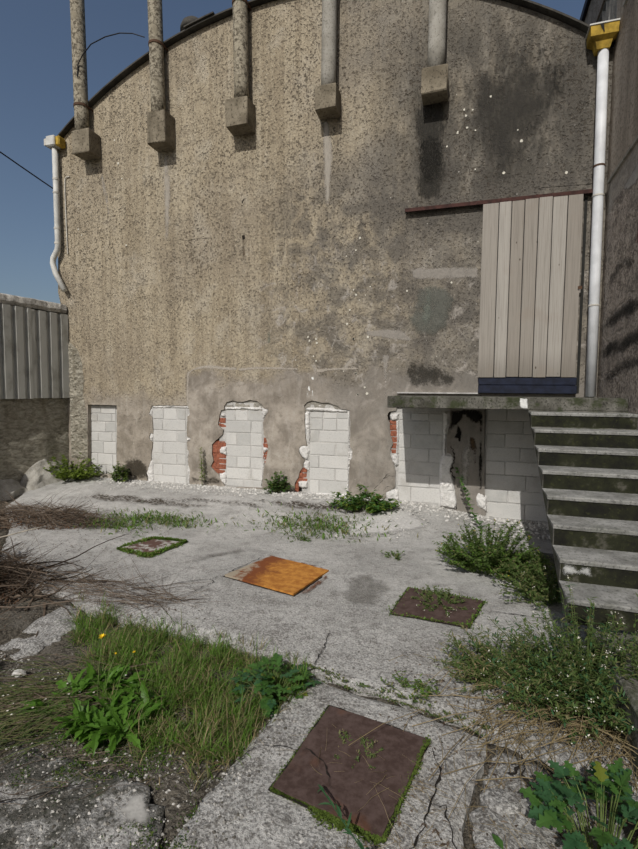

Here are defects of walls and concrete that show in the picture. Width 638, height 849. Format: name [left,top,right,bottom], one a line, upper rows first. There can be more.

water stain [416,103,447,198]
water stain [606,301,635,325]
water stain [603,334,638,356]
spalling [219,400,266,427]
spalling [305,401,340,412]
flaking render [212,441,226,474]
flaking render [295,468,307,492]